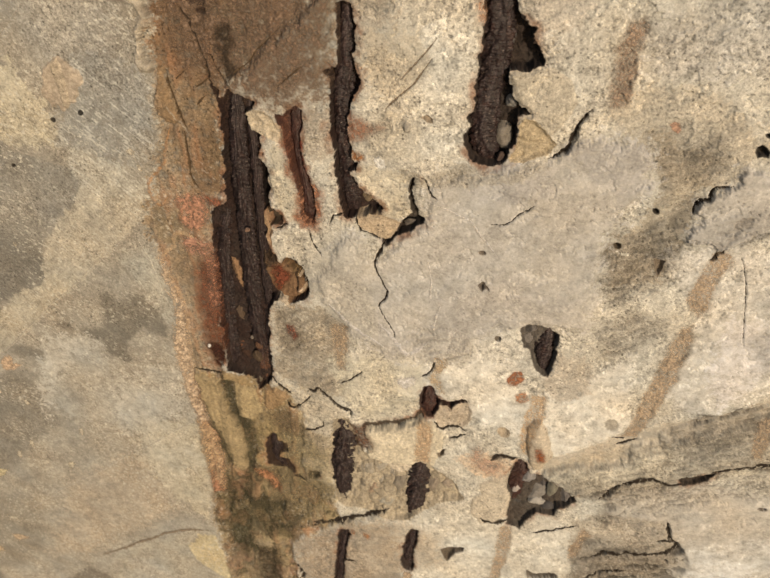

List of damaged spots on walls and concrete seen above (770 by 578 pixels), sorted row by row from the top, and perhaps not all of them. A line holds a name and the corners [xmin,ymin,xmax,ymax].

spalling [166,70,199,188]
peeling [194,0,659,472]
rust [175,193,225,365]
crack [329,206,395,336]
crack [273,371,466,439]
spalling [329,385,574,570]
crack [611,436,635,444]
crack [599,477,682,499]
crack [711,463,770,474]
spalling [334,529,351,578]
spalling [526,570,557,578]